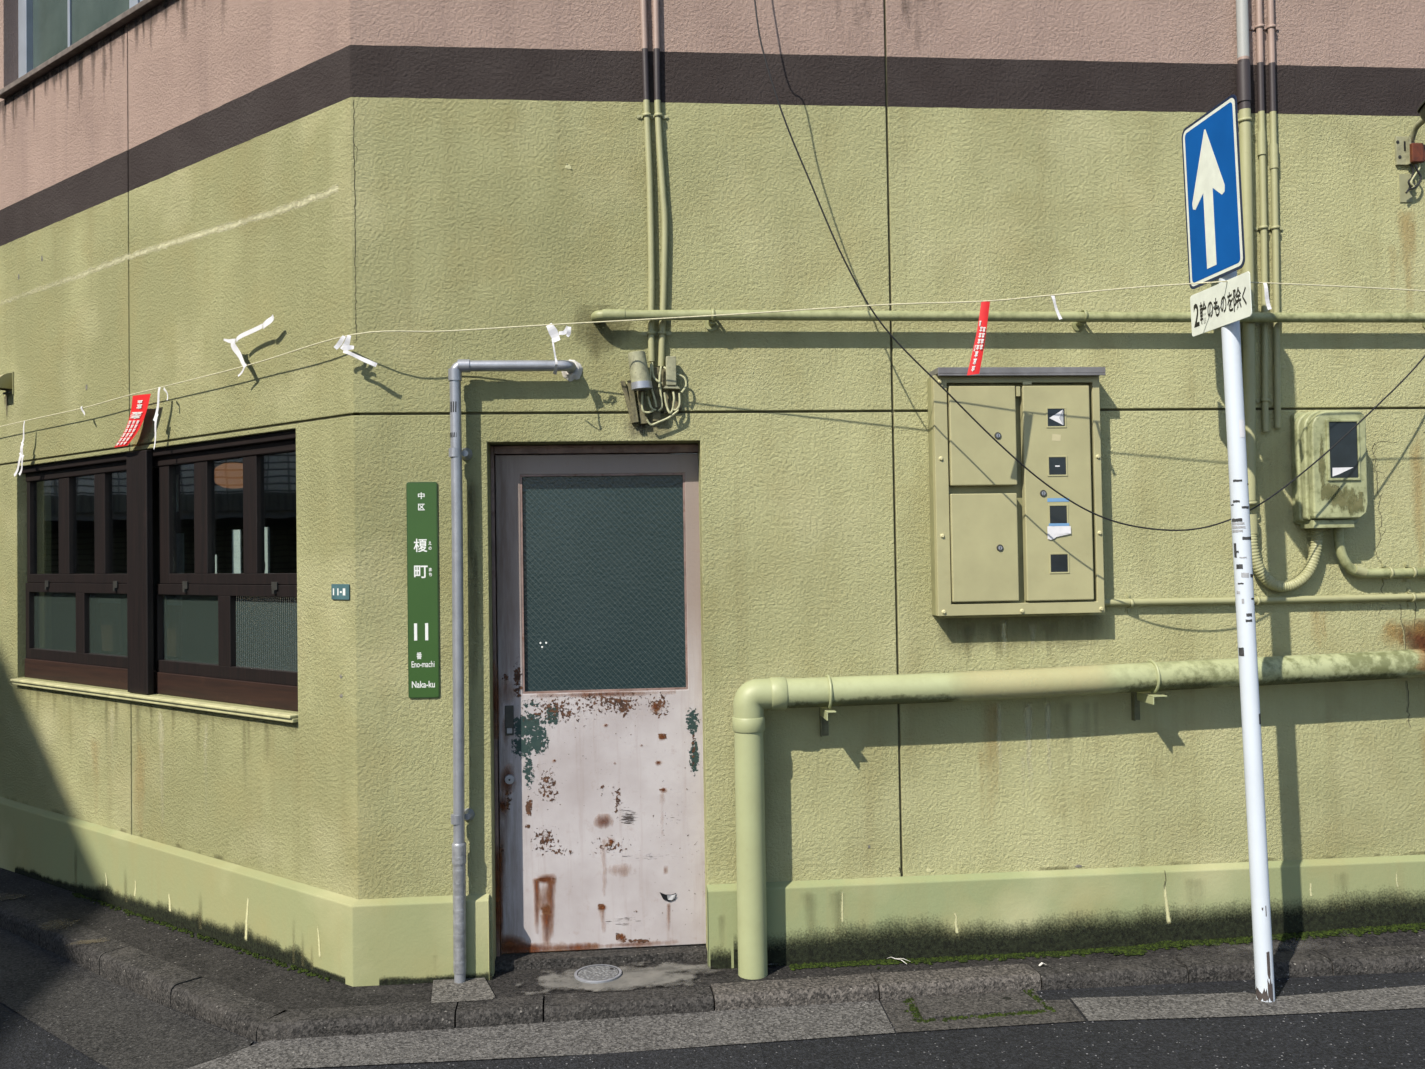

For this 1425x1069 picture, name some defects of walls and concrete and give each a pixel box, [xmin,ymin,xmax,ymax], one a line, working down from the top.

crack [1371,432,1424,728]
corrosion [1401,624,1425,653]
water stain [15,867,345,984]
water stain [710,942,738,969]
water stain [767,907,1253,967]
water stain [1270,892,1425,935]